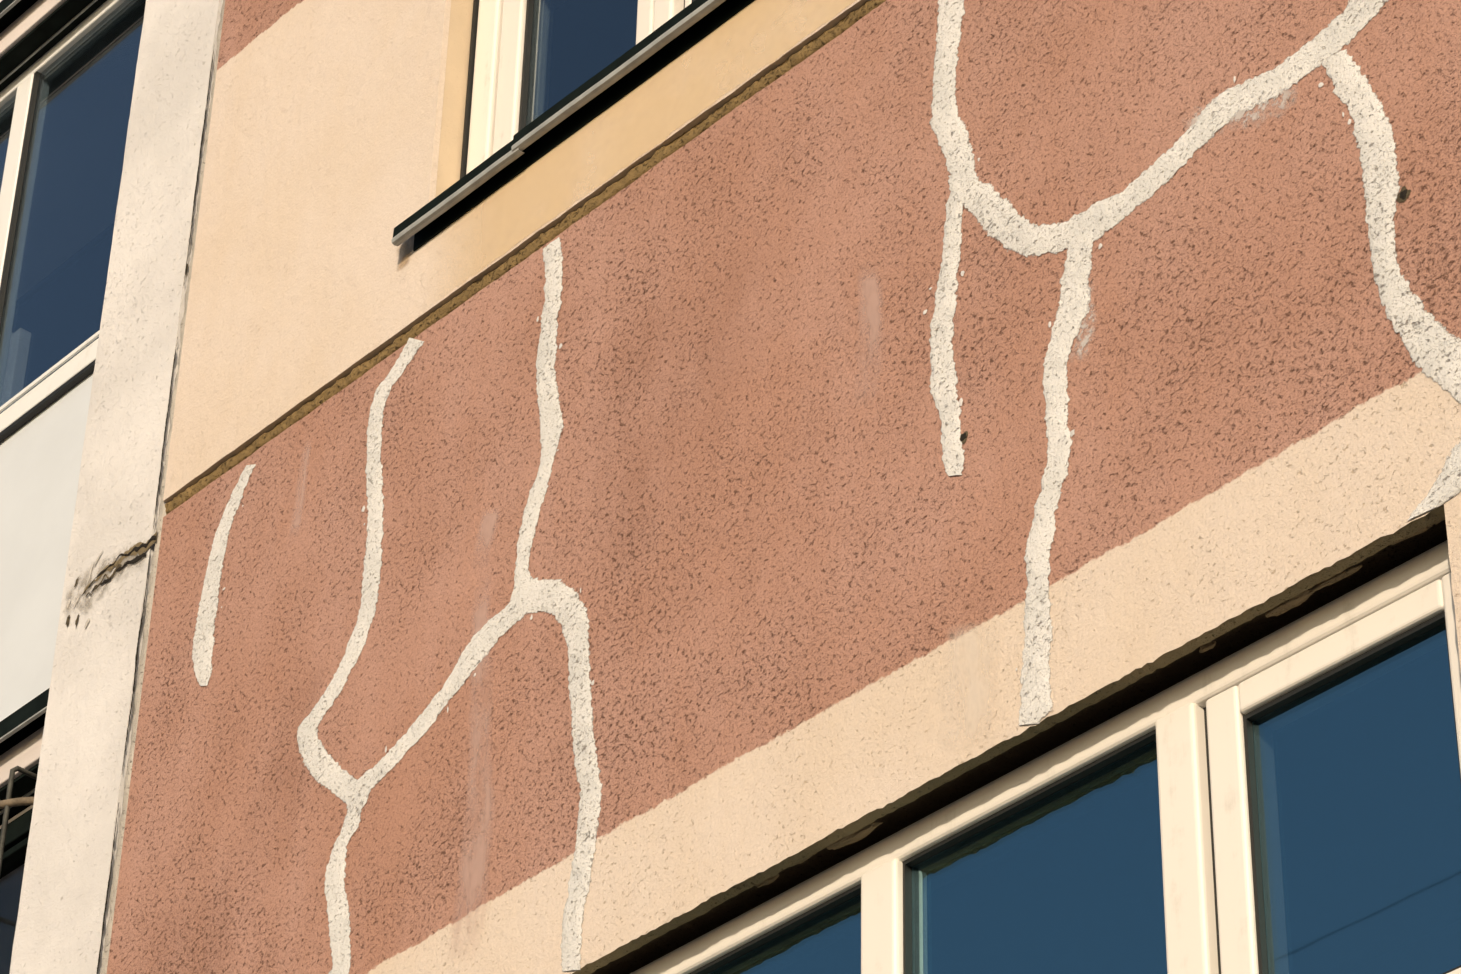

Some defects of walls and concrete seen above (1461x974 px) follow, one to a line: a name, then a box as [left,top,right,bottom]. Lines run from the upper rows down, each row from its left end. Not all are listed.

crack [96,337,178,974]
crack [184,49,214,284]
crack [192,464,256,686]
crack [297,237,603,974]
crack [923,0,1461,725]